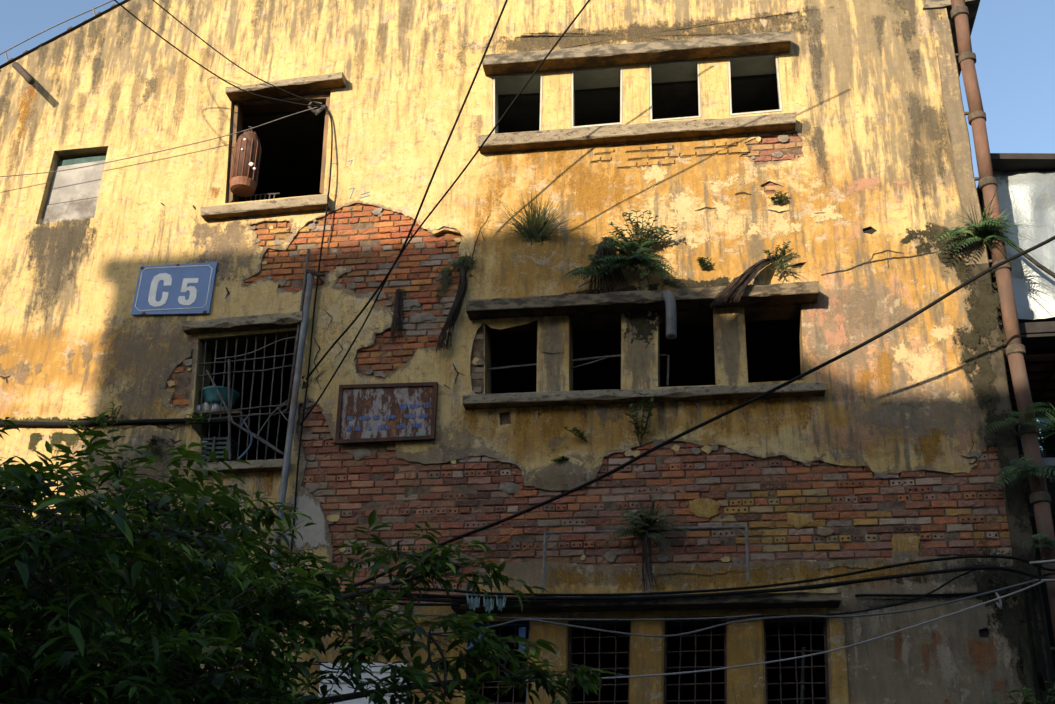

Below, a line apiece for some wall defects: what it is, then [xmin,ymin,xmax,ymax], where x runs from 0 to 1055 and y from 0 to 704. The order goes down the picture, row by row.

damp [37,0,170,95]
damp [484,2,823,105]
damp [874,0,941,81]
flaking render [590,131,843,249]
damp [801,120,827,184]
damp [25,218,94,320]
flaking render [243,203,468,379]
flaking render [164,340,196,409]
flaking render [470,322,485,394]
peeling [891,325,954,386]
damp [900,222,1036,533]
flaking render [296,375,1012,609]